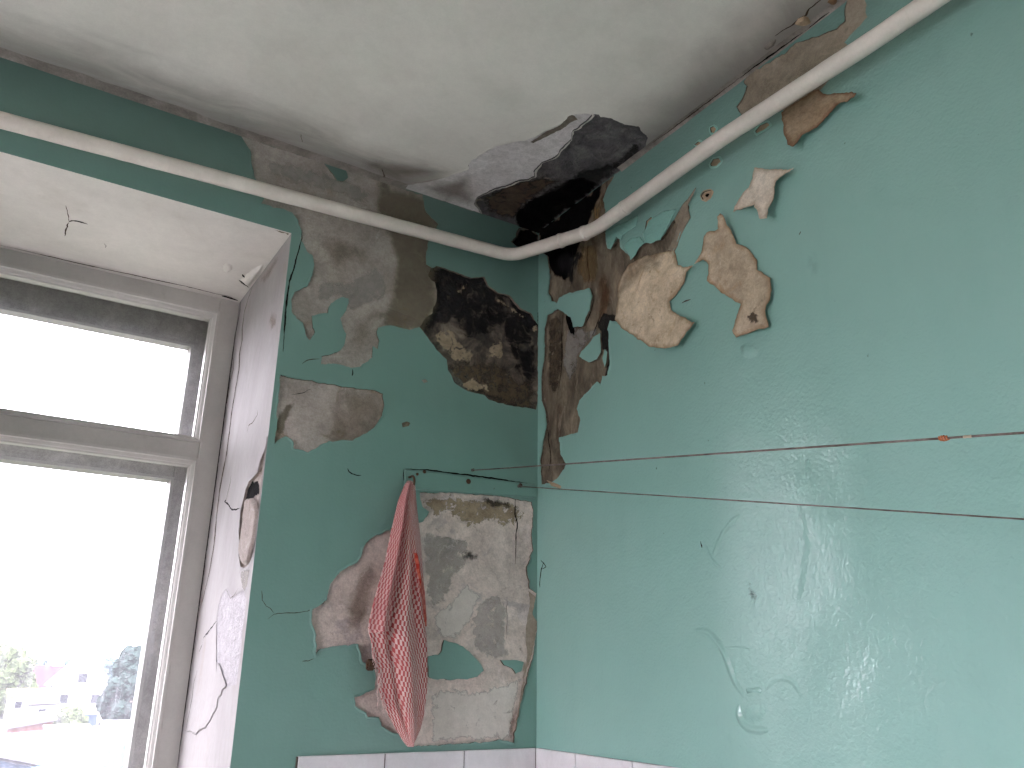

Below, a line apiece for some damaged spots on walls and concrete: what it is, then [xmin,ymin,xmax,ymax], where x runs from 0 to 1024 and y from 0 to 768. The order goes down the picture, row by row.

flaking render [239,111,794,486]
damp [516,144,639,233]
flaking render [735,0,868,115]
peeling [754,80,856,147]
crack [1,207,258,766]
flaking render [187,374,386,735]
flaking render [309,491,538,749]